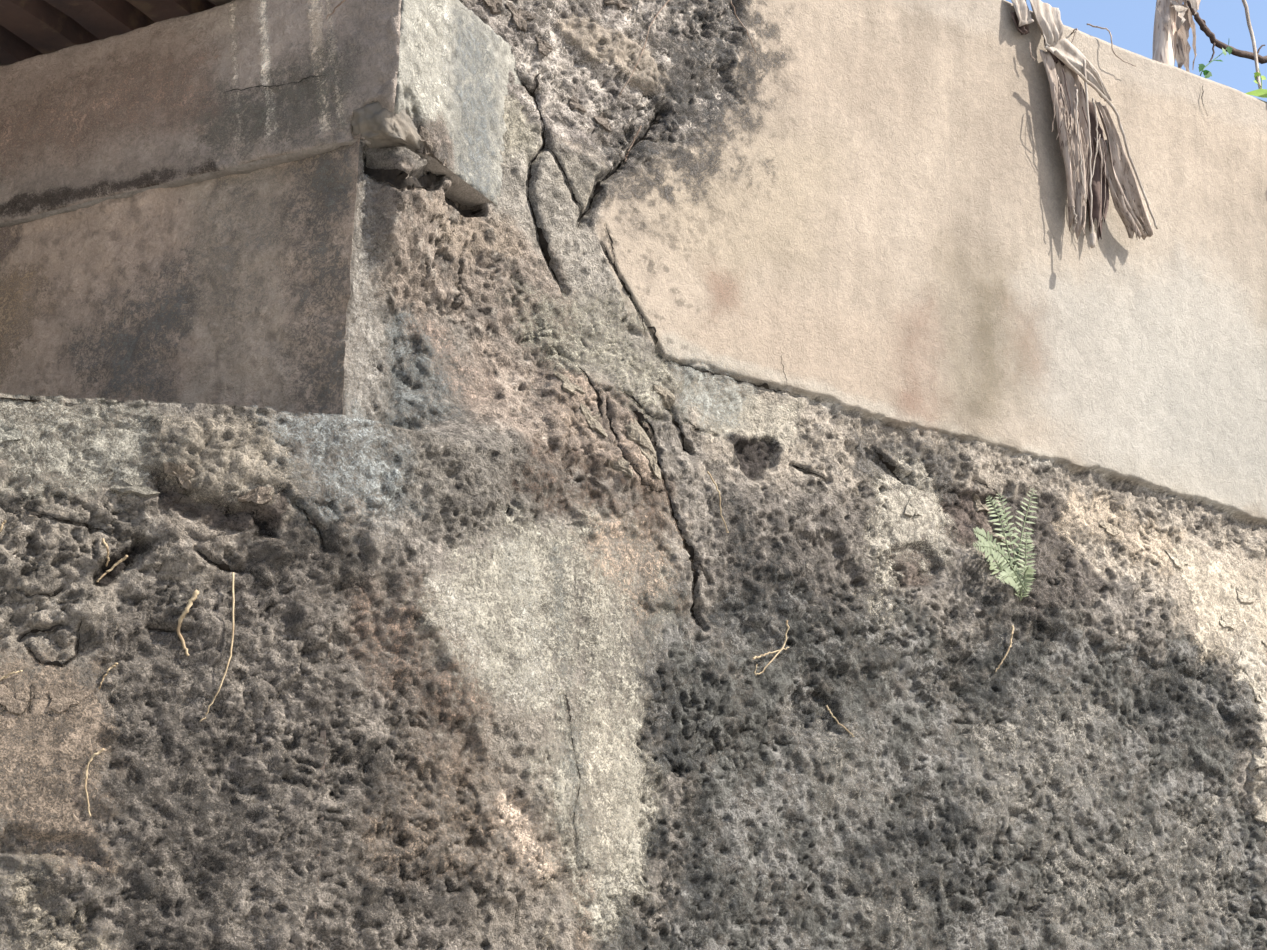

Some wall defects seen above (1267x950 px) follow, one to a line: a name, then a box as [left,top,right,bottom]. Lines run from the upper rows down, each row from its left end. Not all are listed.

leakage [68,0,500,518]
spalling [351,101,454,169]
crack [514,69,799,395]
leakage [583,0,790,206]
crack [1,503,118,539]
crack [553,347,718,628]
leakage [853,431,960,504]
crack [20,588,82,712]
spalling [601,452,1267,950]